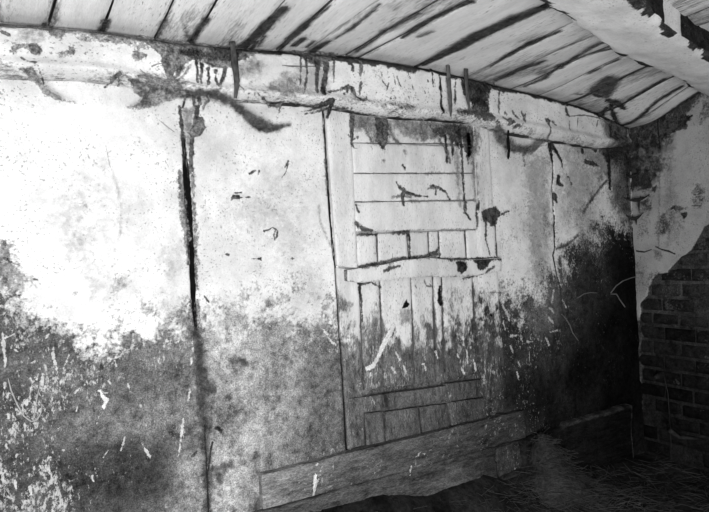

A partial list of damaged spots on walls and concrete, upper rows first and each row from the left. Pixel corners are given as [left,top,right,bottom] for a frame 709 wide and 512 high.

crack [162,104,214,512]
water stain [239,59,261,89]
water stain [269,80,299,93]
crack [548,143,578,335]
crack [582,149,611,213]
water stain [576,76,683,246]
flaking render [639,237,709,468]